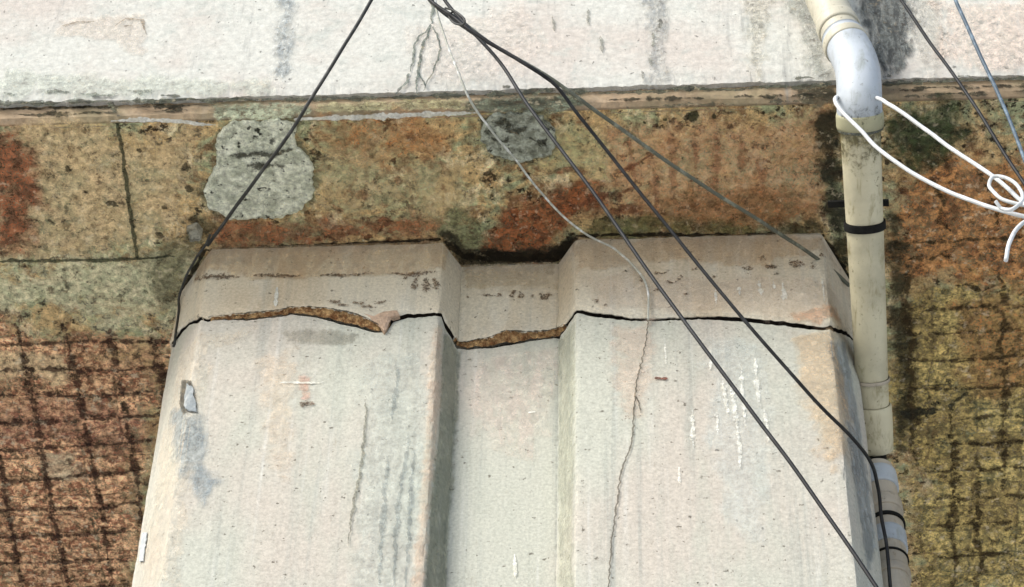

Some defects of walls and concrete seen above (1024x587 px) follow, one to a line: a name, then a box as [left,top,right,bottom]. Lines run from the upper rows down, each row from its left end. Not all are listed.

crack [395,5,442,95]
leakage [859,0,921,74]
rust [0,133,42,251]
rust [479,166,642,252]
leakage [172,408,214,497]
crack [0,306,853,587]
efflorescence [716,358,769,466]